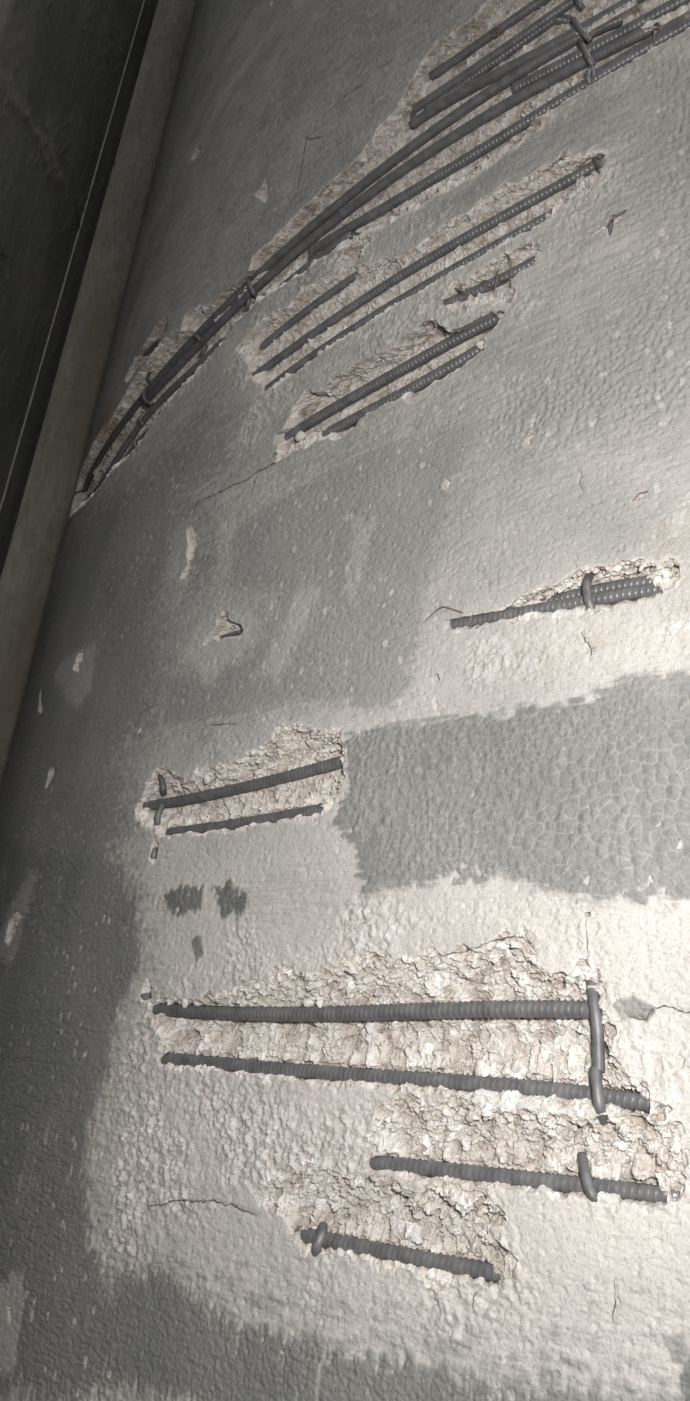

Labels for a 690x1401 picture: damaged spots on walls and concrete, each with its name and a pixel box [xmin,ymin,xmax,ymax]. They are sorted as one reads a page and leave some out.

spalling [69,0,690,518]
peeling [183,596,257,680]
peeling [414,422,690,717]
crack [150,1199,255,1215]
peeling [77,722,690,1401]